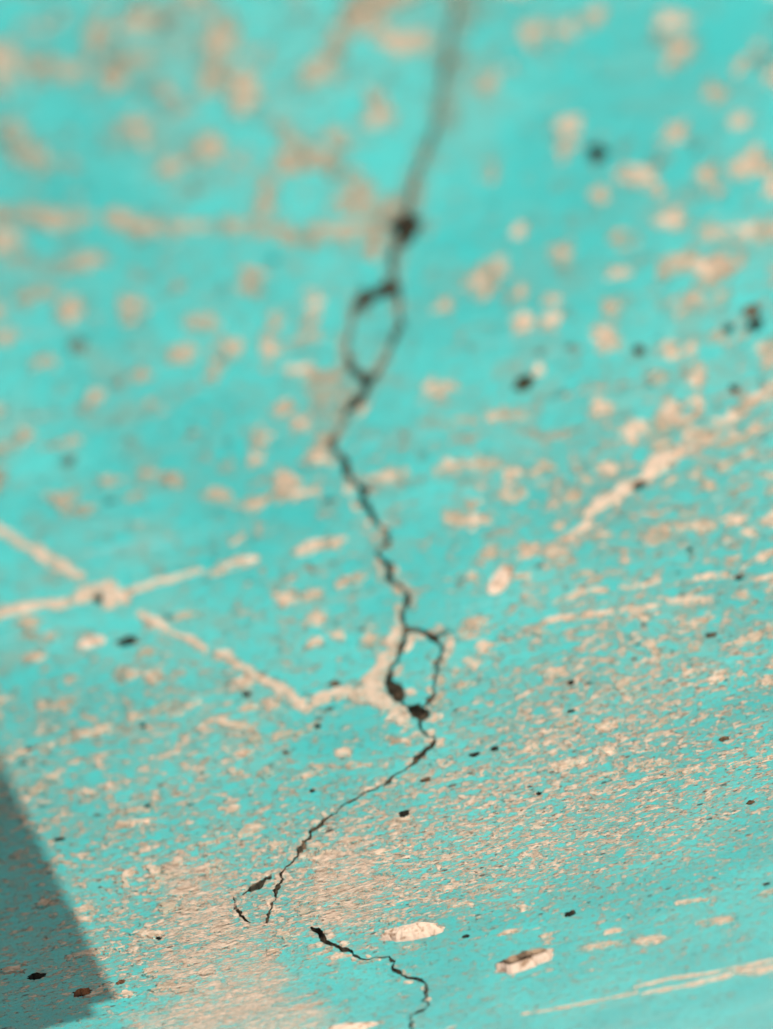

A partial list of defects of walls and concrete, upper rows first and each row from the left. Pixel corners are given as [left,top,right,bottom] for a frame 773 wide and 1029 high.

peeling [556,329,773,509]
crack [233,0,460,927]
peeling [433,453,558,532]
peeling [638,471,773,546]
peeling [465,522,574,595]
peeling [205,559,501,781]
peeling [111,804,419,961]
peeling [302,941,381,965]
crack [310,927,430,1029]
peeling [377,917,446,951]
peeling [494,931,557,975]
peeling [328,1021,383,1029]